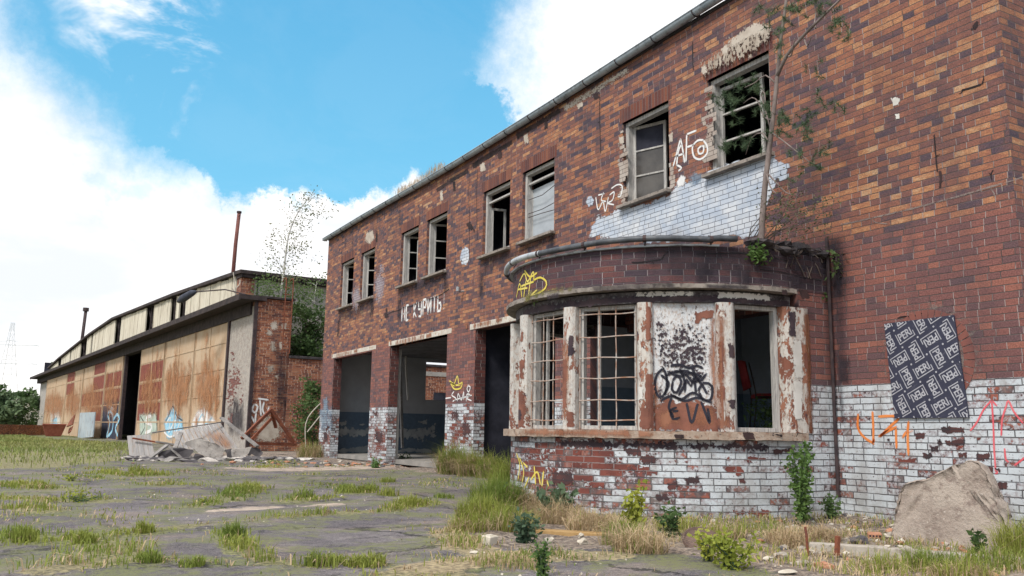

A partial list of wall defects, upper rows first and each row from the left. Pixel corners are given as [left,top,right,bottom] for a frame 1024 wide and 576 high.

spalling [698,19,771,163]
rust [45,366,120,420]
rust [141,339,220,425]
flaking render [227,352,243,422]
peeling [518,290,793,500]
peeling [322,410,473,453]
peeling [725,509,771,521]